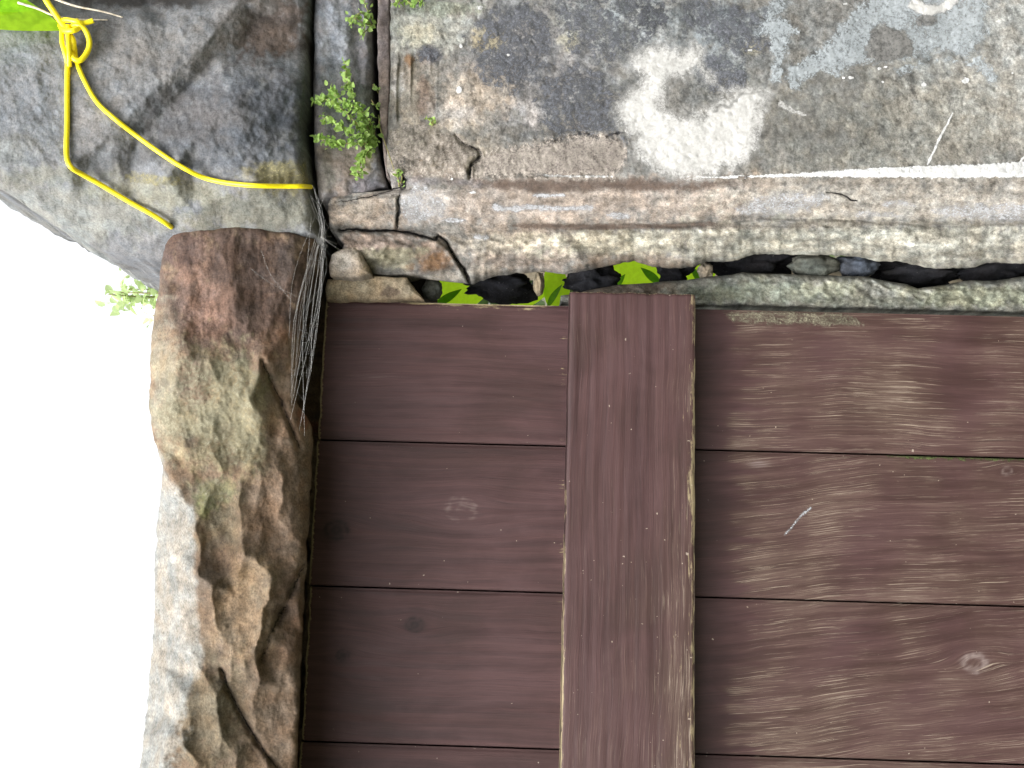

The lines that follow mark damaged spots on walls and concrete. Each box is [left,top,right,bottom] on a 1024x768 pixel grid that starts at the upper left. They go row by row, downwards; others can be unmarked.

crack [458,138,482,178]
water stain [484,0,806,230]